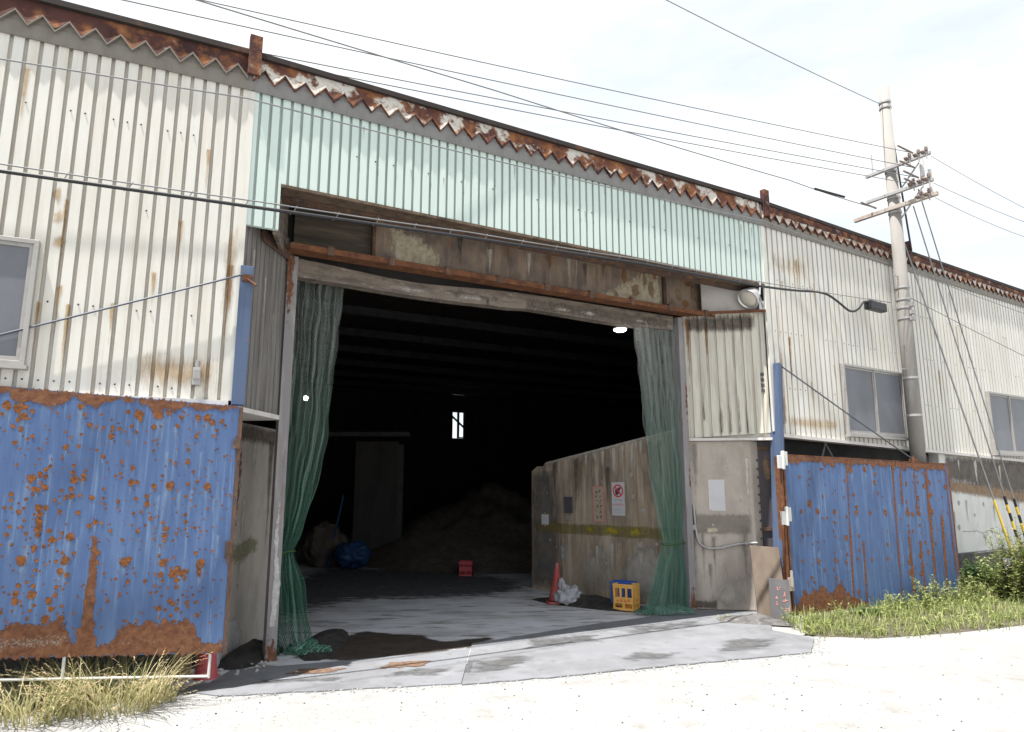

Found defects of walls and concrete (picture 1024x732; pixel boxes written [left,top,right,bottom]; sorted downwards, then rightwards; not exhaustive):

rust [286,255,295,323]
rust [0,386,244,661]
rust [787,456,958,615]